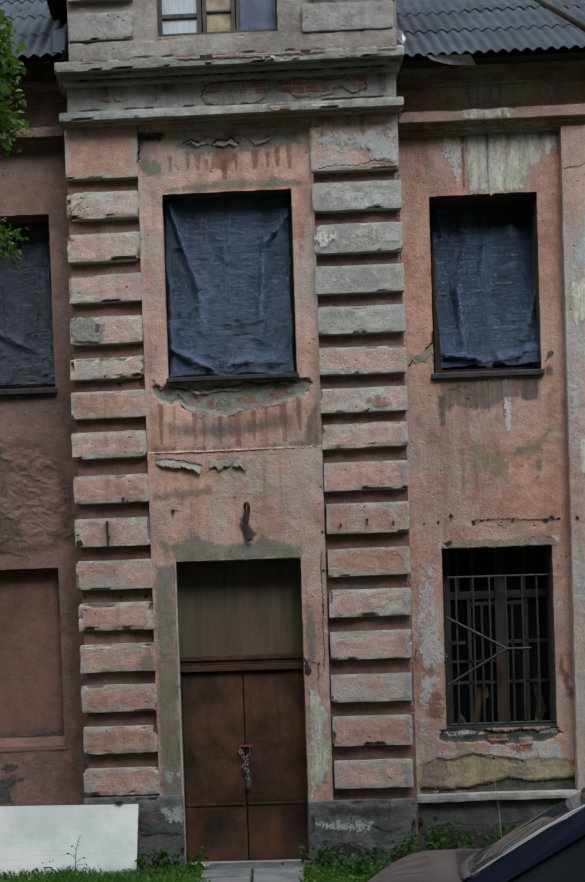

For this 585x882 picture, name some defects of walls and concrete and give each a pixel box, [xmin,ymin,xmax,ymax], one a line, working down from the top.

flaking render [200,76,367,110]
peeling [311,118,399,179]
leakage [430,64,566,195]
flaking render [153,379,312,418]
flaking render [406,564,575,794]